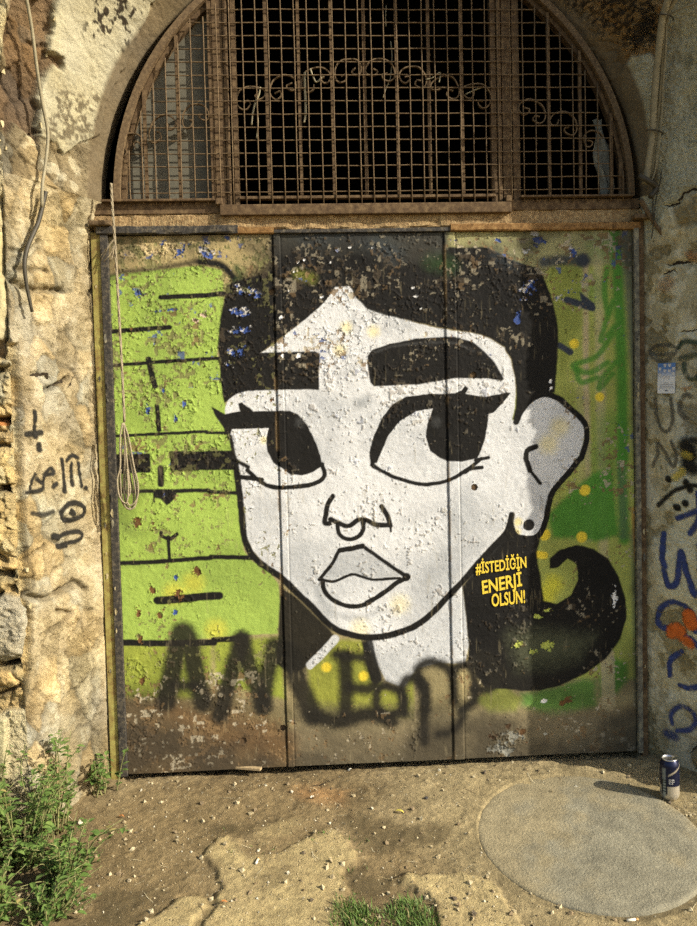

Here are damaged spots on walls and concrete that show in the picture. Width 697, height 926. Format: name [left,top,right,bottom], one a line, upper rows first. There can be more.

leakage [86,0,136,44]
leakage [573,0,657,48]
flaking render [0,0,61,155]
crack [664,188,697,207]